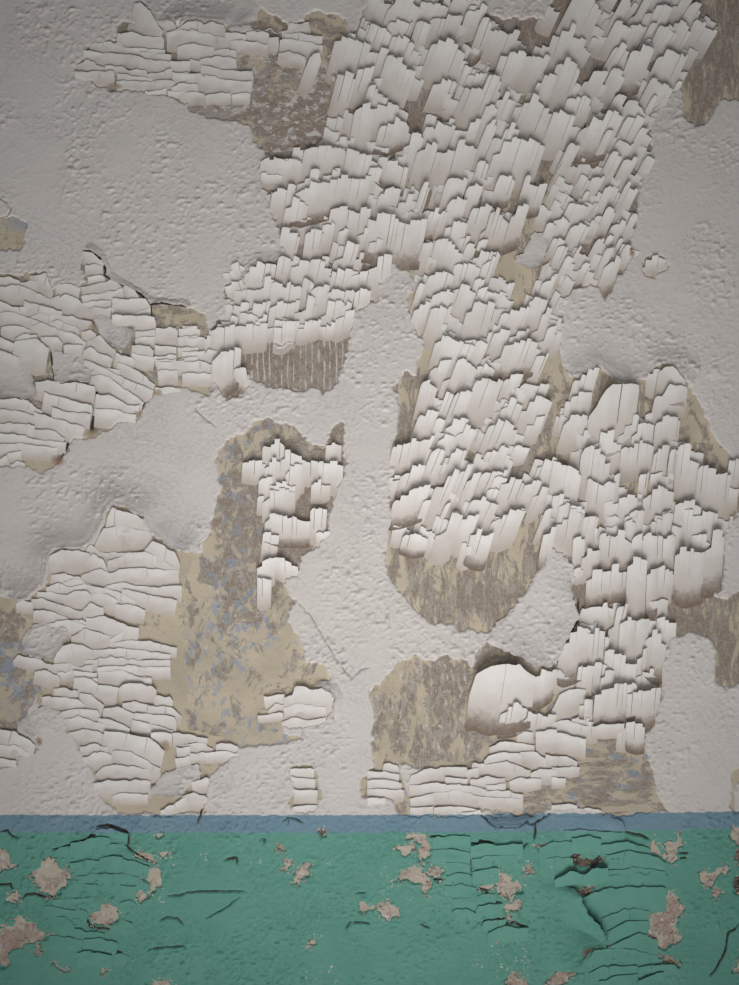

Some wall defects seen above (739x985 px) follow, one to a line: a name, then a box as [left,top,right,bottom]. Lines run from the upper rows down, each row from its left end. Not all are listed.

flaking render [0,0,739,473]
peeling [359,157,739,985]
flaking render [0,418,345,820]
crack [0,883,53,898]
peeling [0,828,174,979]
crack [55,823,156,863]
crack [87,919,130,953]
crack [154,890,241,949]
peeling [273,842,314,886]
crack [470,813,549,927]
crack [625,831,649,839]
crack [710,927,737,976]